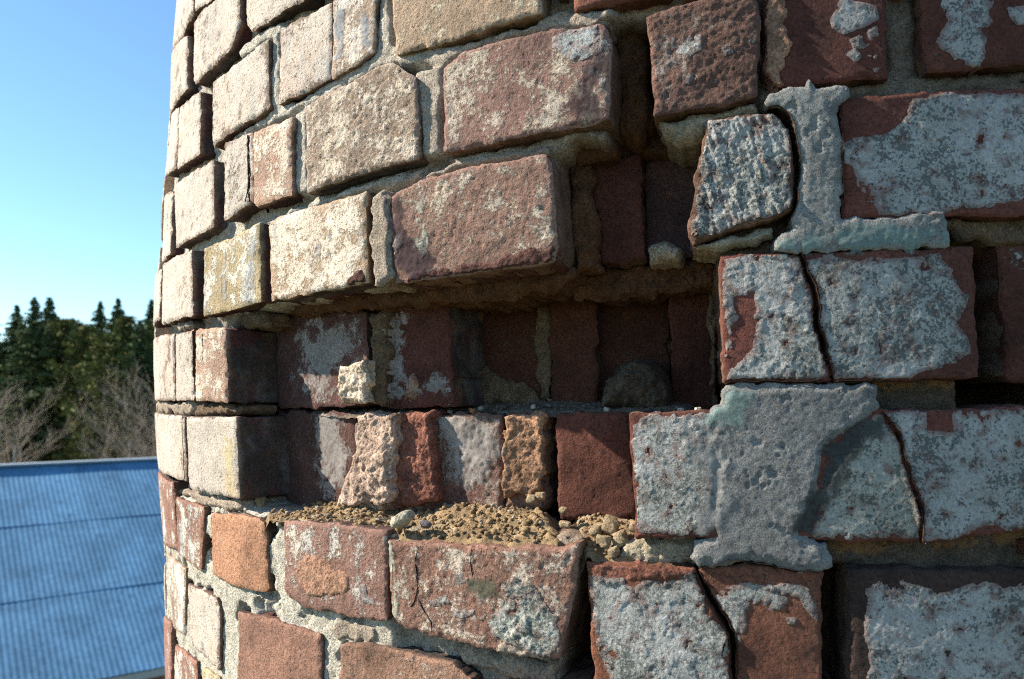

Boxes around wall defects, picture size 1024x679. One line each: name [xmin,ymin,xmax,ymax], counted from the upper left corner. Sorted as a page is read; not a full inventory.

peeling [936,0,994,76]
peeling [691,114,792,255]
peeling [841,91,1024,216]
crack [730,252,877,384]
peeling [717,253,971,384]
spalling [336,360,451,508]
spalling [501,410,558,498]
crack [883,413,925,543]
crack [410,550,432,634]
peeling [587,559,818,679]
crack [695,560,820,679]
peeling [864,580,1024,679]